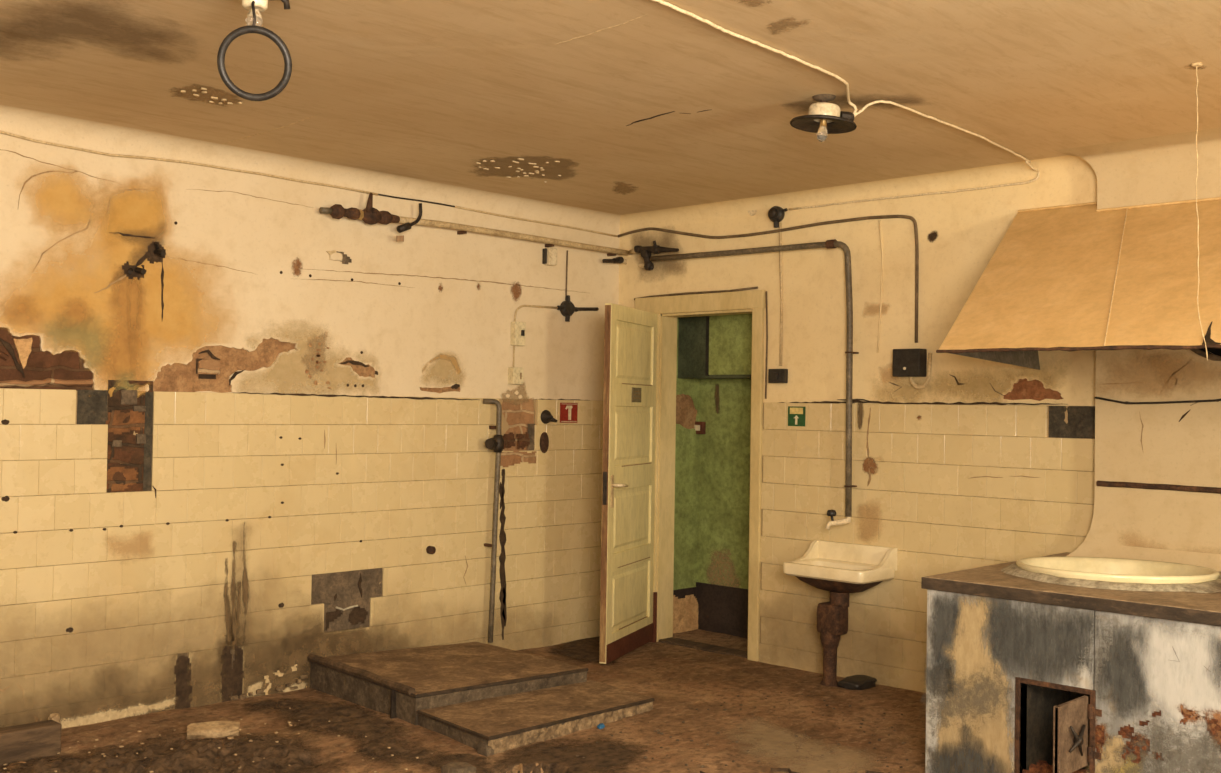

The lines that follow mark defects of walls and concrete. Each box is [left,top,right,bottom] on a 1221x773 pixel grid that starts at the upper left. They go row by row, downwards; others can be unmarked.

water stain [0,174,218,397]
peeling [0,327,378,498]
flaking render [500,384,536,467]
corrosion [857,402,877,486]
peeling [1004,378,1095,439]
water stain [224,541,249,646]
peeling [311,568,383,633]
water stain [936,600,1014,773]
water stain [1095,737,1139,773]
corrosion [1095,710,1164,763]
water stain [1145,627,1221,727]
corrosion [1178,704,1221,746]